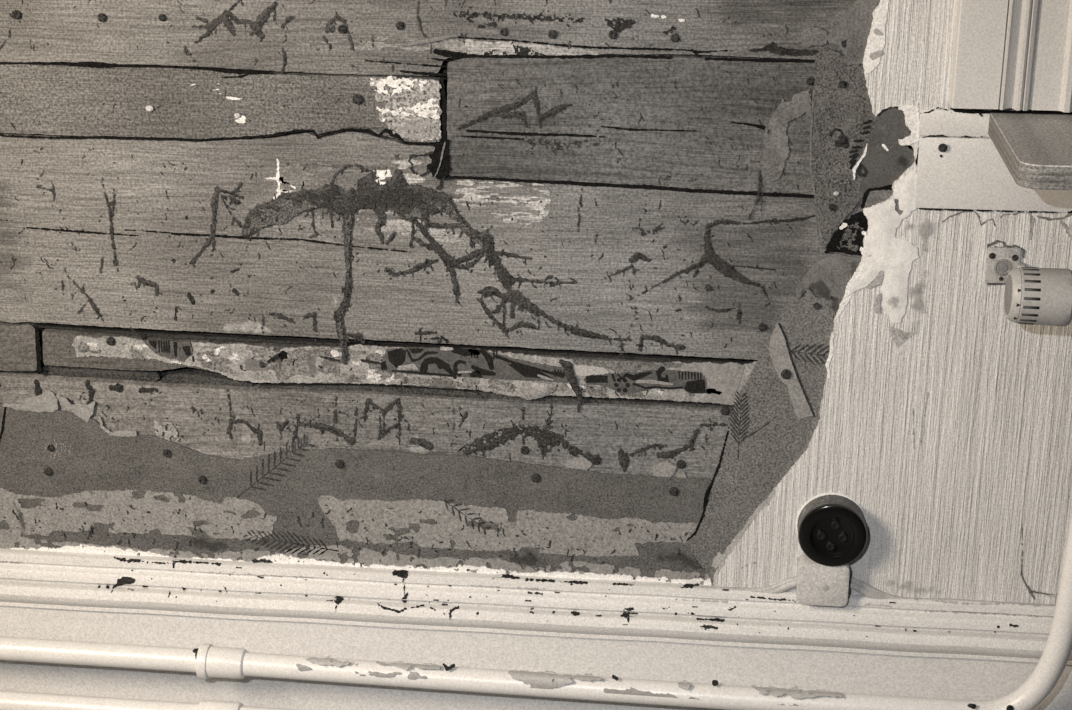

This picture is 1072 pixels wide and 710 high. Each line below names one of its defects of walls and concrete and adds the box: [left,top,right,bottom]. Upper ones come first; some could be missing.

peeling [354,34,599,56]
peeling [365,76,442,142]
peeling [375,157,432,185]
peeling [453,180,551,225]
peeling [357,210,464,244]
leakage [224,321,270,332]
crack [0,407,8,441]
peeling [314,394,521,451]
peeling [11,544,171,557]
peeling [193,553,711,585]
peeling [296,656,455,680]
peeling [508,670,698,699]